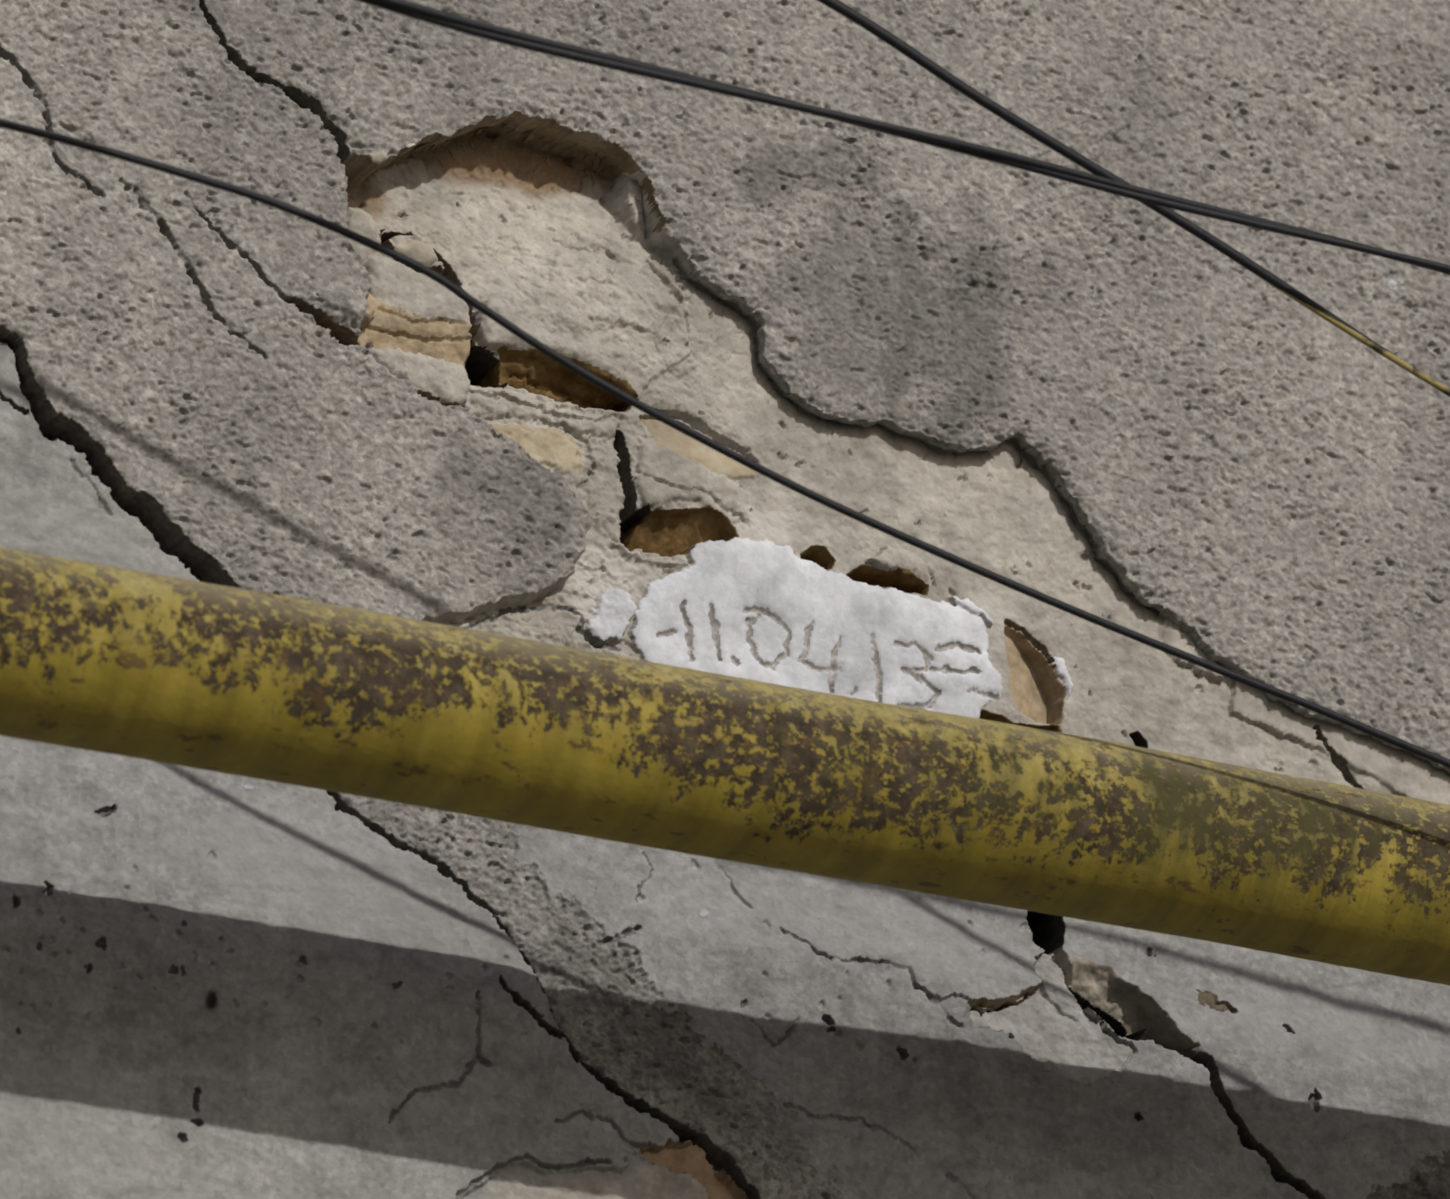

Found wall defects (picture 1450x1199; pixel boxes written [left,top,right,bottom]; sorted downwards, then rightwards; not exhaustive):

crack [199,0,350,164]
crack [0,42,292,360]
crack [0,326,240,588]
spalling [284,111,1450,805]
crack [327,791,761,1199]
crack [746,1016,800,1047]
crack [718,867,964,1029]
spalling [456,1138,749,1199]
crack [1181,1050,1325,1199]
spalling [1366,1150,1450,1199]